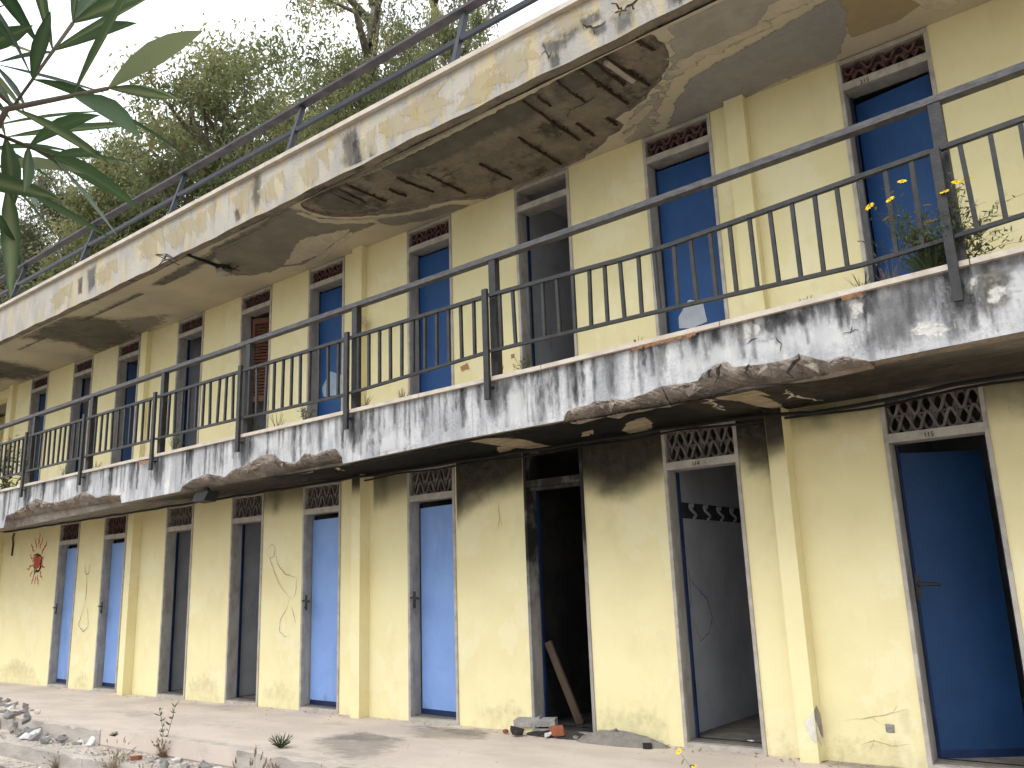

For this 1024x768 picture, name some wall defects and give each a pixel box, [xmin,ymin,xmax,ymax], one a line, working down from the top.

peeling [669,0,847,128]
water stain [314,132,436,197]
spalling [211,27,669,276]
peeling [679,300,707,329]
water stain [711,328,719,351]
water stain [759,312,809,334]
water stain [836,283,932,344]
water stain [944,258,1024,329]
spalling [563,321,875,437]
water stain [674,349,1024,419]
spalling [183,435,342,489]
spalling [6,492,121,520]